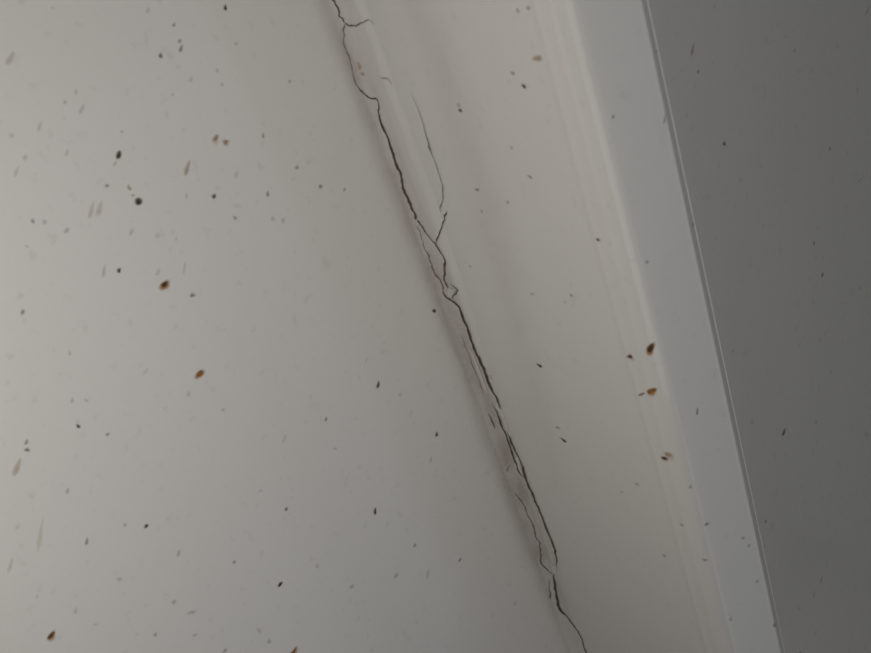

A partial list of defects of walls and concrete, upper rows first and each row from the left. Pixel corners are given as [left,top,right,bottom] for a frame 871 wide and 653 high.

crack [332,0,363,32]
crack [359,88,586,652]